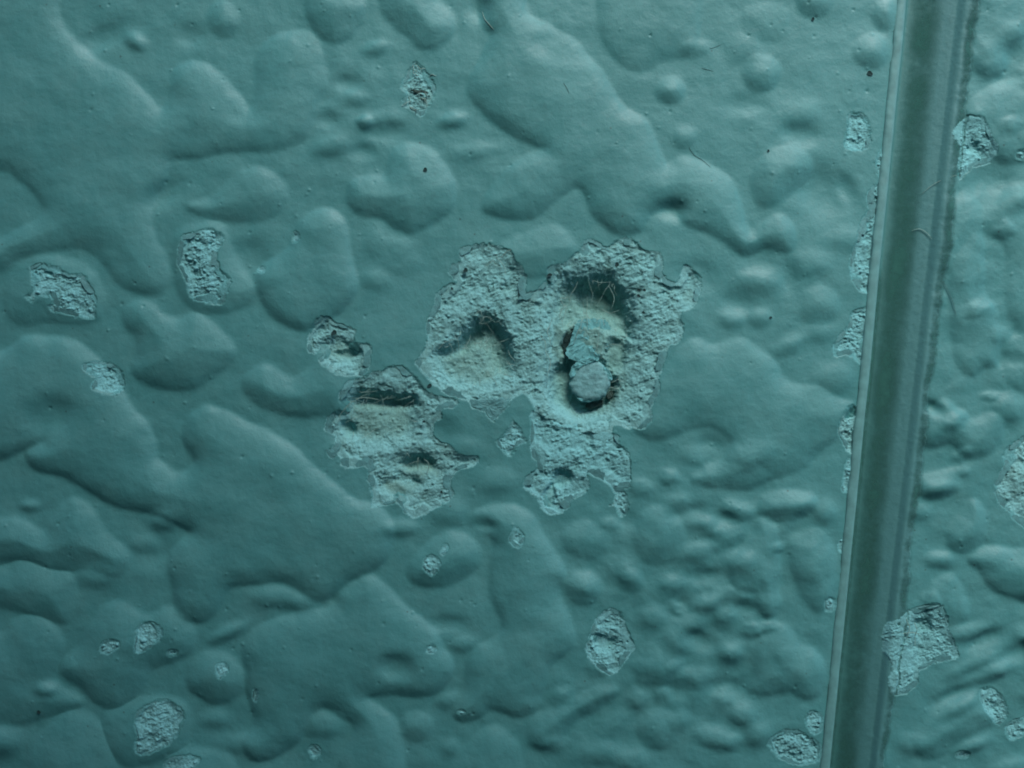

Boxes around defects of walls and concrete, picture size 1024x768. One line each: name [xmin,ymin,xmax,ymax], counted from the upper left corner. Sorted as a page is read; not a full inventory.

peeling [952,115,998,179]
peeling [844,112,882,294]
peeling [28,263,97,319]
peeling [177,228,231,305]
peeling [82,361,125,395]
spalling [307,237,702,518]
peeling [994,436,1024,527]
peeling [585,608,636,675]
peeling [880,603,959,695]
peeling [134,699,201,768]
peeling [767,711,824,766]
peeling [979,688,1024,741]